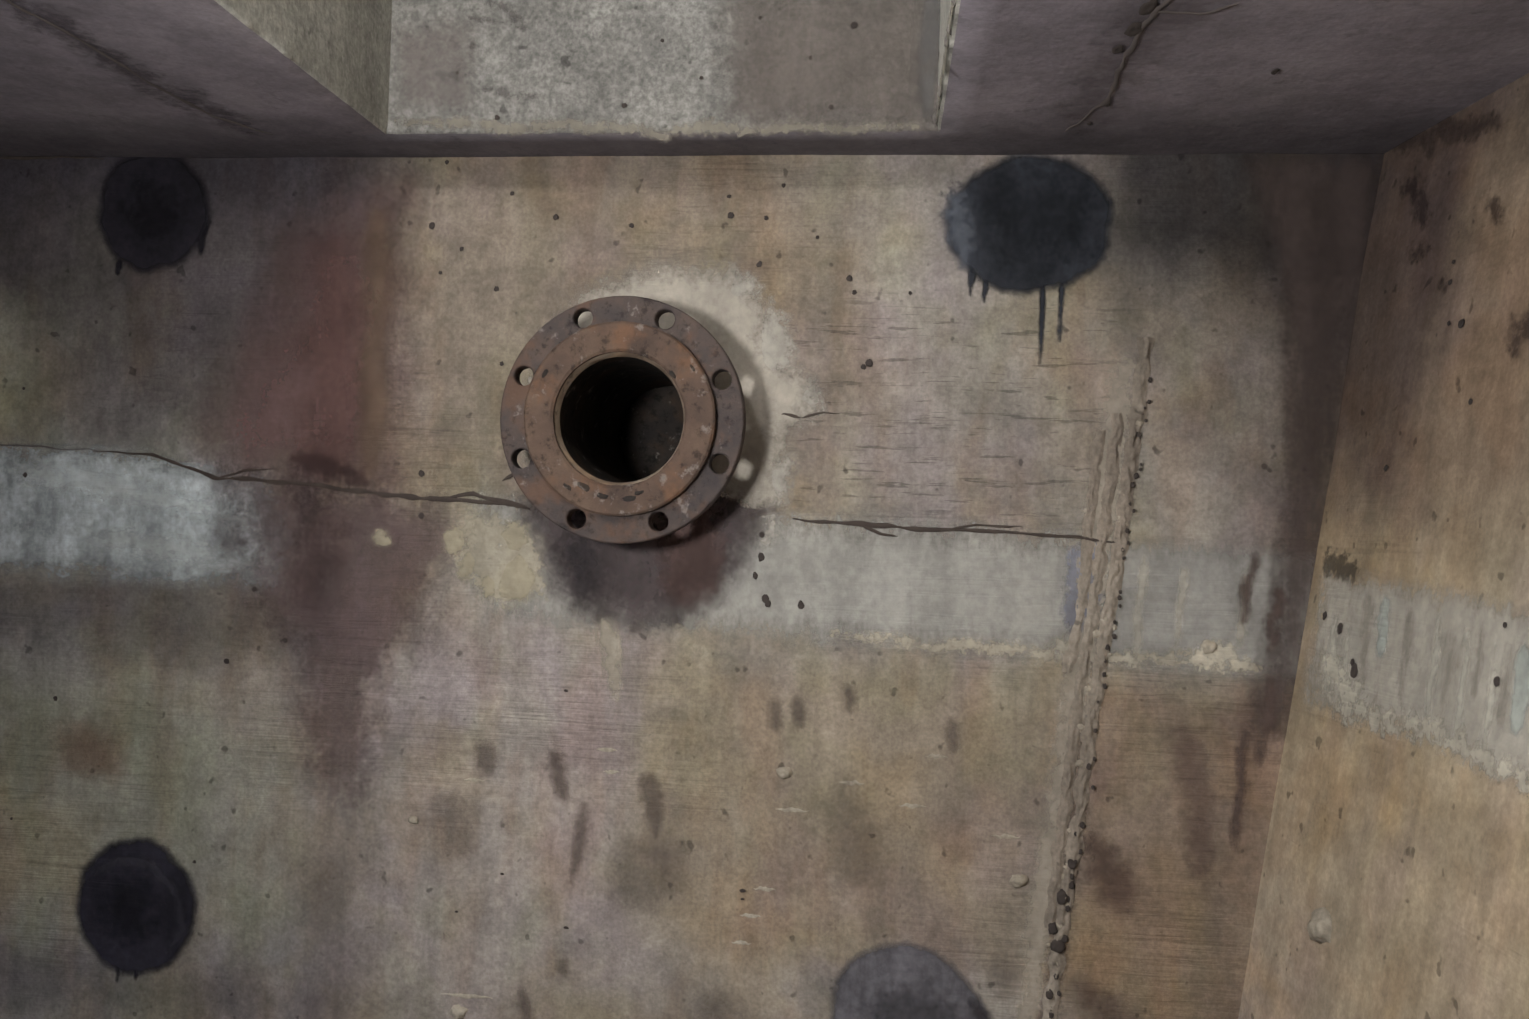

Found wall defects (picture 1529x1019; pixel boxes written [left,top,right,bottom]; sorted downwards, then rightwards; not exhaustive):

crack [5,0,273,135]
crack [0,444,530,510]
corrosion [563,482,644,502]
crack [793,518,1115,543]
water stain [471,491,1080,695]